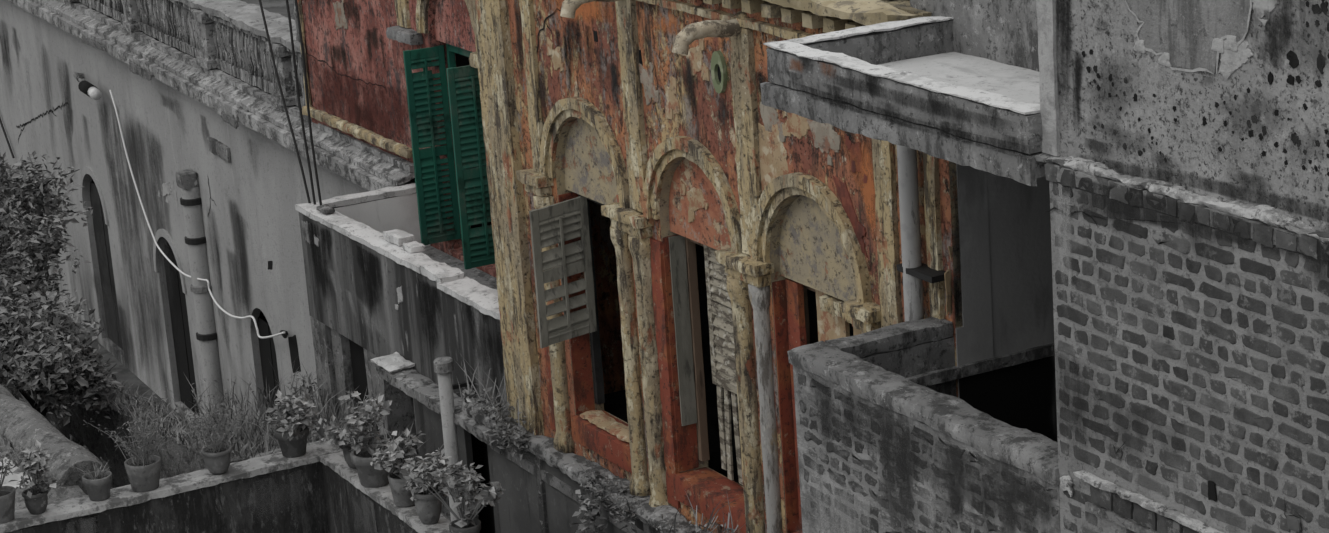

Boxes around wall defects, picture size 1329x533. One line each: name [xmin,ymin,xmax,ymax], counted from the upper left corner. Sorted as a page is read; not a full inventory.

peeling [547,37,564,72]
peeling [639,38,710,120]
leakage [1056,0,1137,118]
peeling [1125,0,1279,79]
leakage [1265,0,1329,88]
leakage [1202,87,1329,176]
peeling [758,102,868,258]
leakage [1081,117,1329,244]
leakage [213,203,249,304]
leakage [308,222,331,296]
leakage [357,247,382,313]
leakage [466,307,504,388]